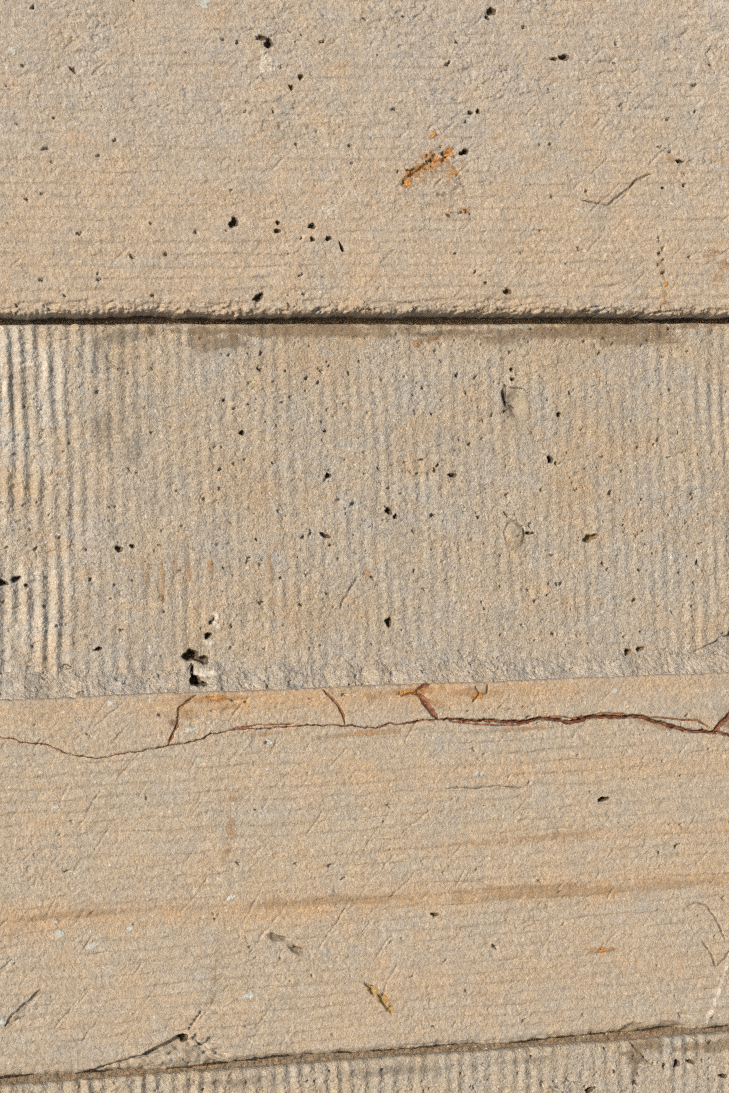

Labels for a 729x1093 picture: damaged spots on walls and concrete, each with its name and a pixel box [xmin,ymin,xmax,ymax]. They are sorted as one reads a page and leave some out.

rust [401,132,462,188]
crack [1,683,729,759]